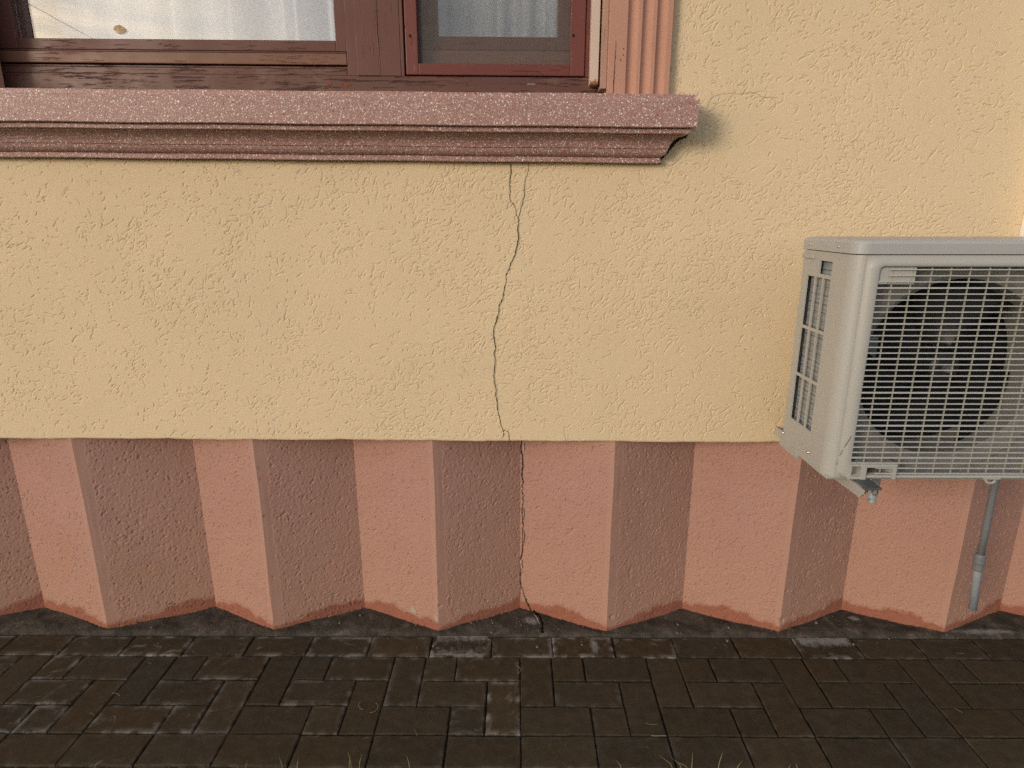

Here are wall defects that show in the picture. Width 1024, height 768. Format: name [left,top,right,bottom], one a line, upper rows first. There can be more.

crack [493,164,531,611]